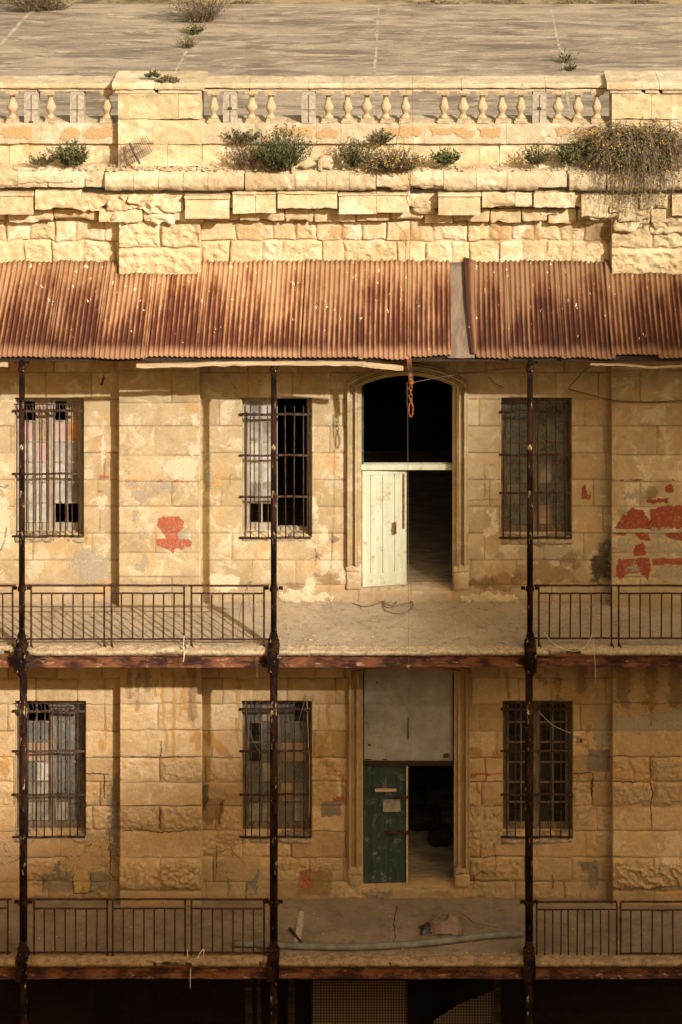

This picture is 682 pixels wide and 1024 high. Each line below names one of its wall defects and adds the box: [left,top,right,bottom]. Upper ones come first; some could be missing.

peeling [125,443,220,573]
flaking render [312,497,340,545]
peeling [612,464,682,583]
spalling [278,577,336,603]
water stain [591,540,611,581]
crack [573,757,653,830]
spalling [42,823,112,894]